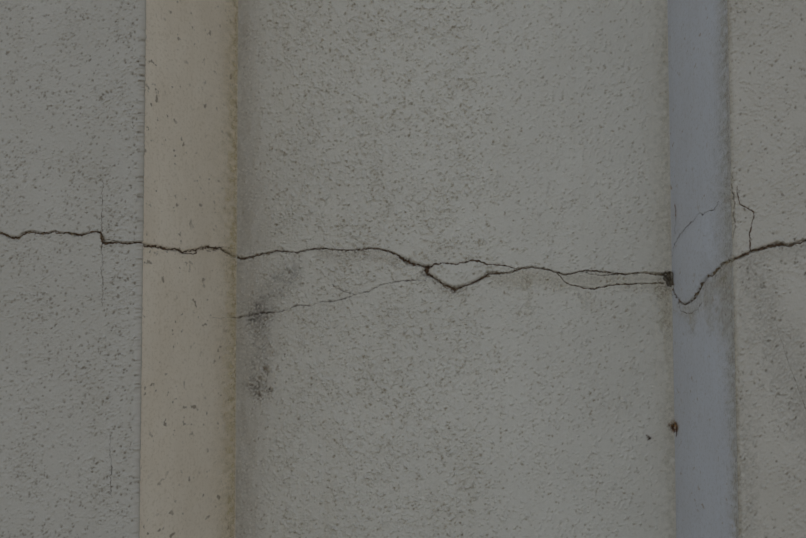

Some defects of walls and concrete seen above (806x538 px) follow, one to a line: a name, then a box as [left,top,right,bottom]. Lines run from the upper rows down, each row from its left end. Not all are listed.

crack [0,186,806,314]